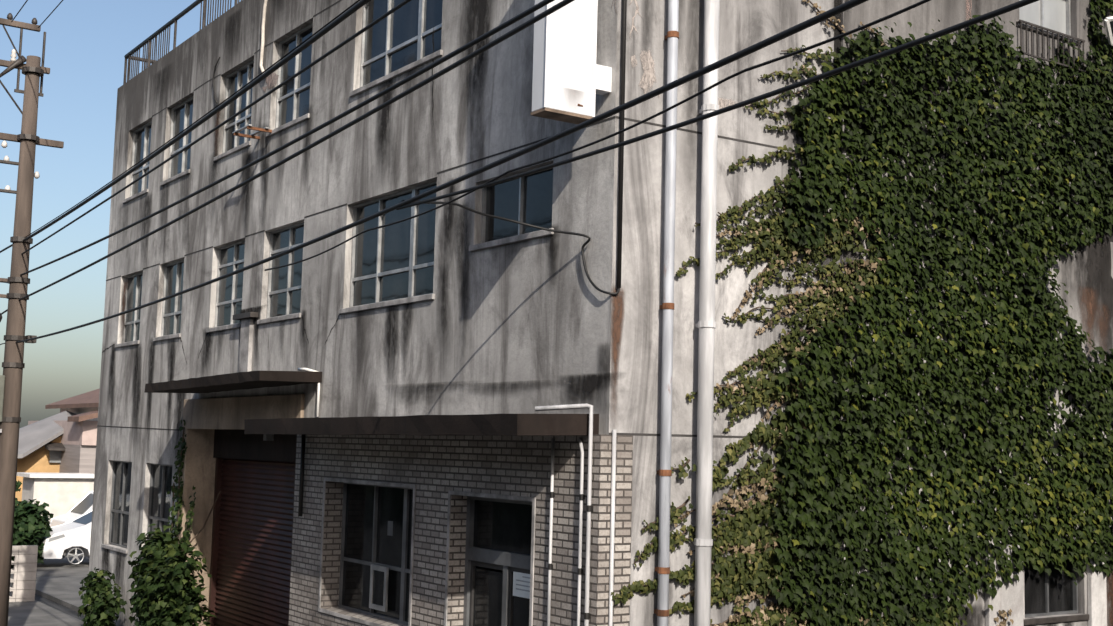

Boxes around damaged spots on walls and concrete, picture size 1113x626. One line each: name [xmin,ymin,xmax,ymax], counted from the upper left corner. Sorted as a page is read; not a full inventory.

leakage [467,0,492,112]
leakage [378,79,395,163]
leakage [142,184,168,246]
leakage [243,132,268,225]
rust [612,288,624,386]
leakage [133,343,154,425]
leakage [168,340,185,450]
leakage [103,549,124,585]